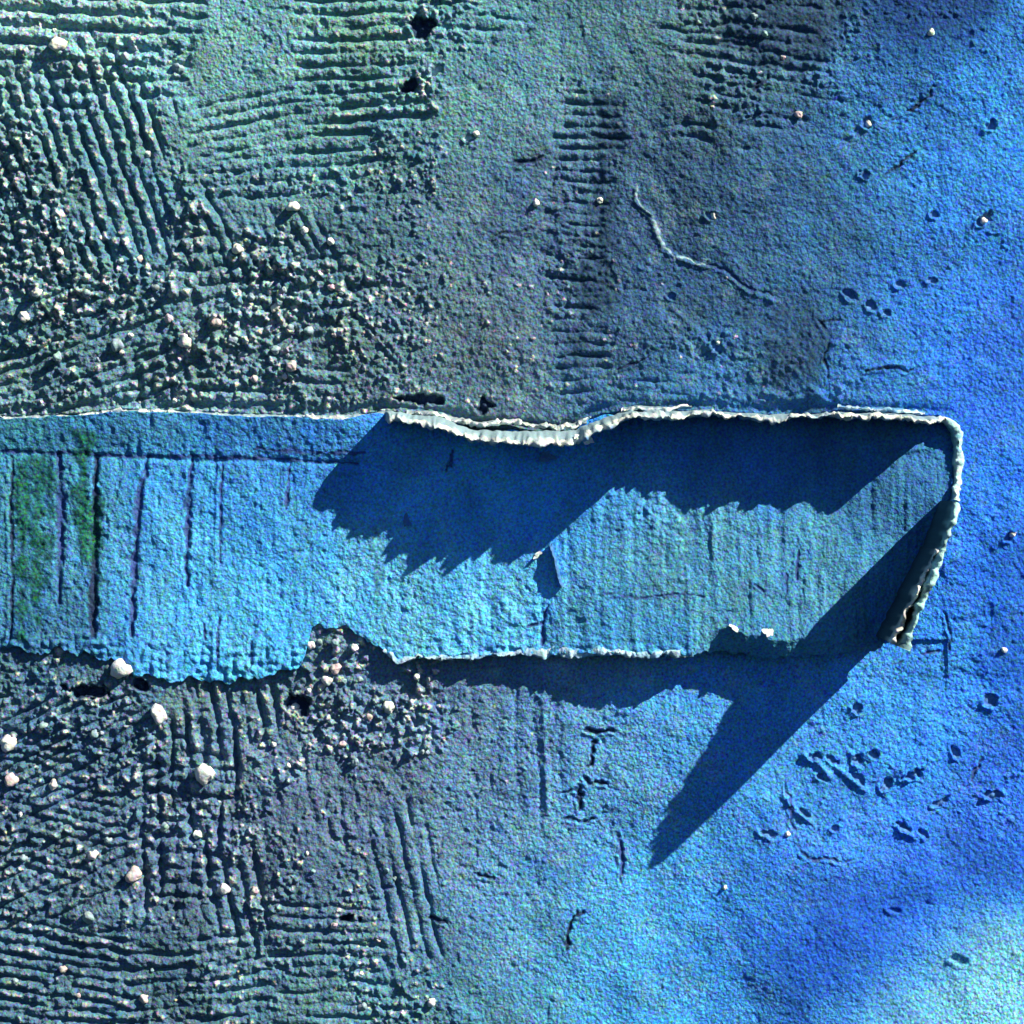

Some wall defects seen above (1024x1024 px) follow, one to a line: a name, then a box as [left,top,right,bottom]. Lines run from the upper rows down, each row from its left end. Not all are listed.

spalling [477,397,494,415]
peeling [533,543,564,588]
spalling [134,678,149,691]
crack [562,728,615,822]
crack [617,835,625,880]
crack [564,911,585,950]